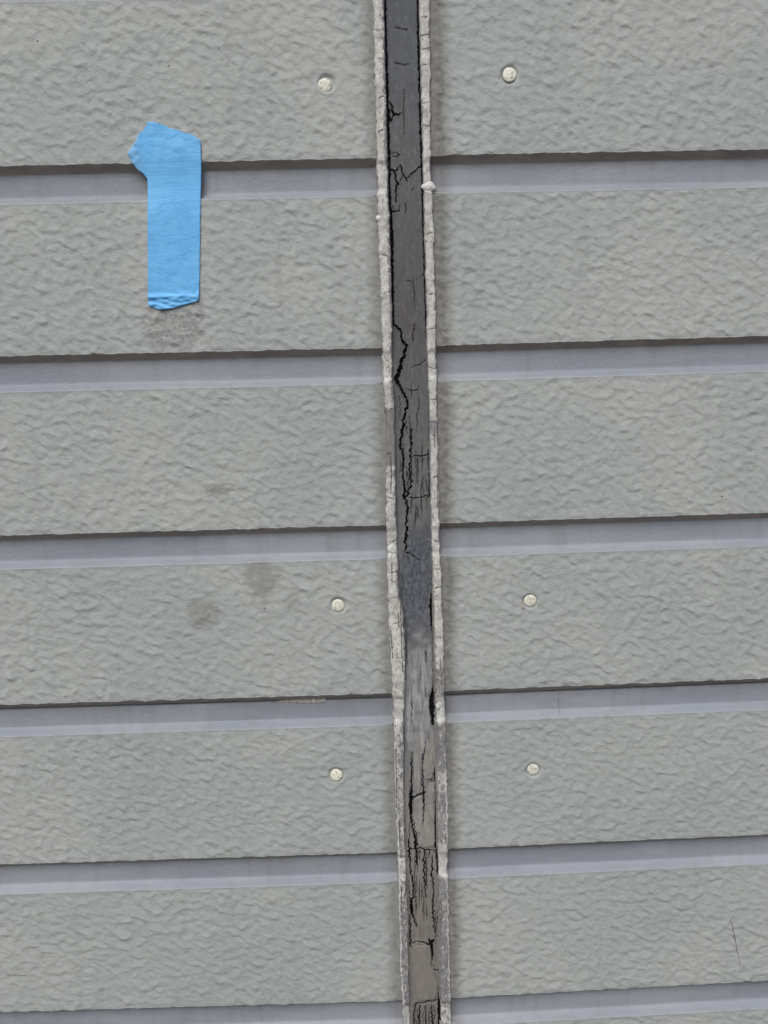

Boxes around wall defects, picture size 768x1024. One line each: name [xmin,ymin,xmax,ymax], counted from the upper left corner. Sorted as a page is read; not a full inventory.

crack [375,0,442,1024]